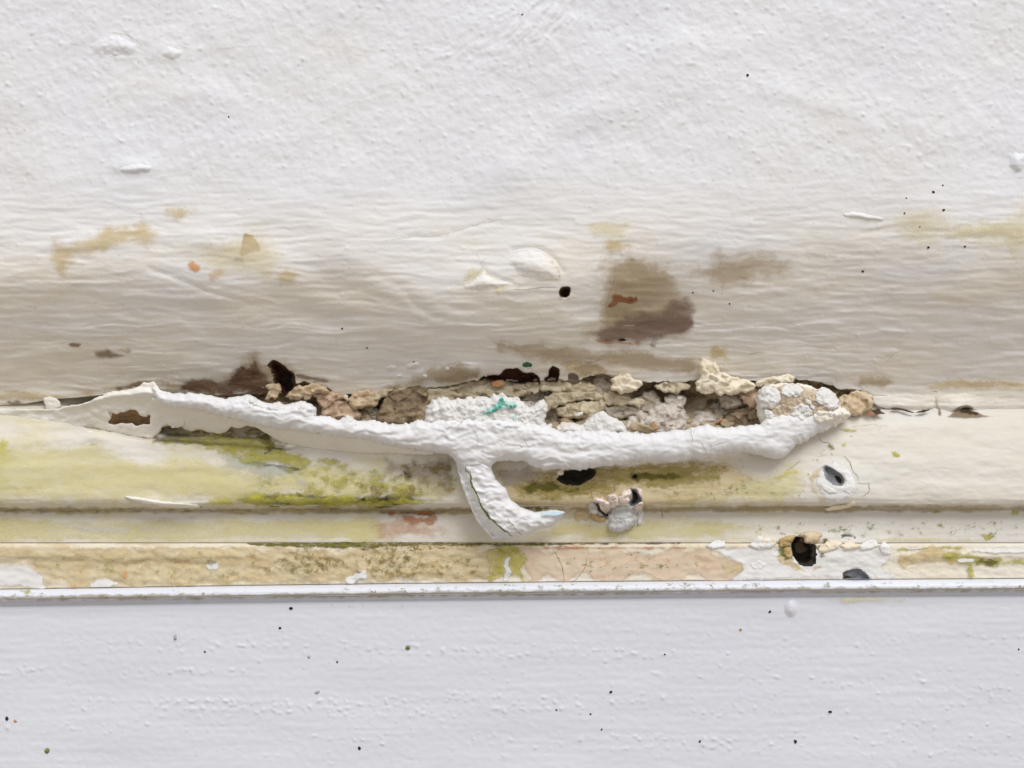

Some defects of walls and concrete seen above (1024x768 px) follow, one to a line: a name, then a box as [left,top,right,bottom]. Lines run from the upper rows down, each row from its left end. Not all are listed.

damp [52,225,149,271]
damp [499,261,694,376]
spalling [0,358,1024,438]
spalling [761,531,860,558]